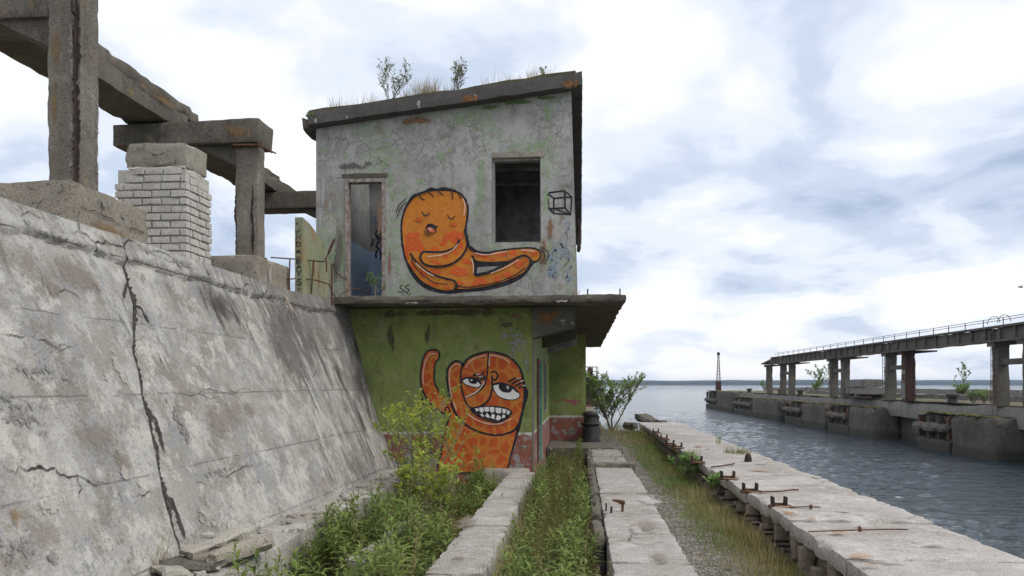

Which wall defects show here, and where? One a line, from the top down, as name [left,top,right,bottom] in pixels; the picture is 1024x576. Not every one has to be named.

crack [4,198,186,549]